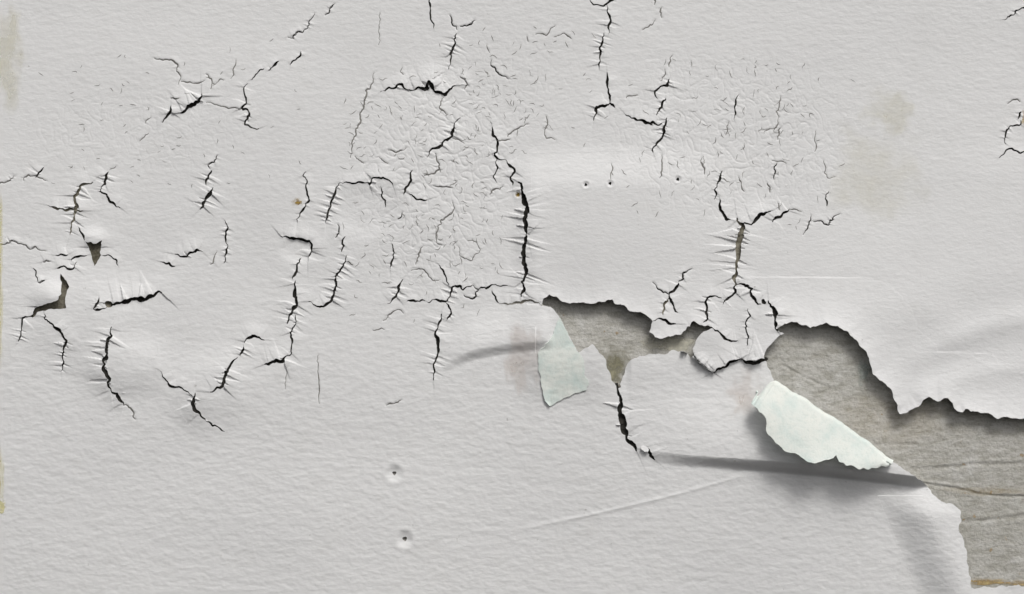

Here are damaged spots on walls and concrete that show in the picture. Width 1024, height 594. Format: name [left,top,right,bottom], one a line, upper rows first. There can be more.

crack [590,0,672,177]
crack [999,99,1024,158]
crack [18,315,68,371]
crack [0,166,120,283]
crack [93,290,162,419]
crack [140,0,555,432]
crack [654,269,691,325]
crack [693,97,839,373]
crack [615,383,655,460]
peeling [538,295,1024,589]